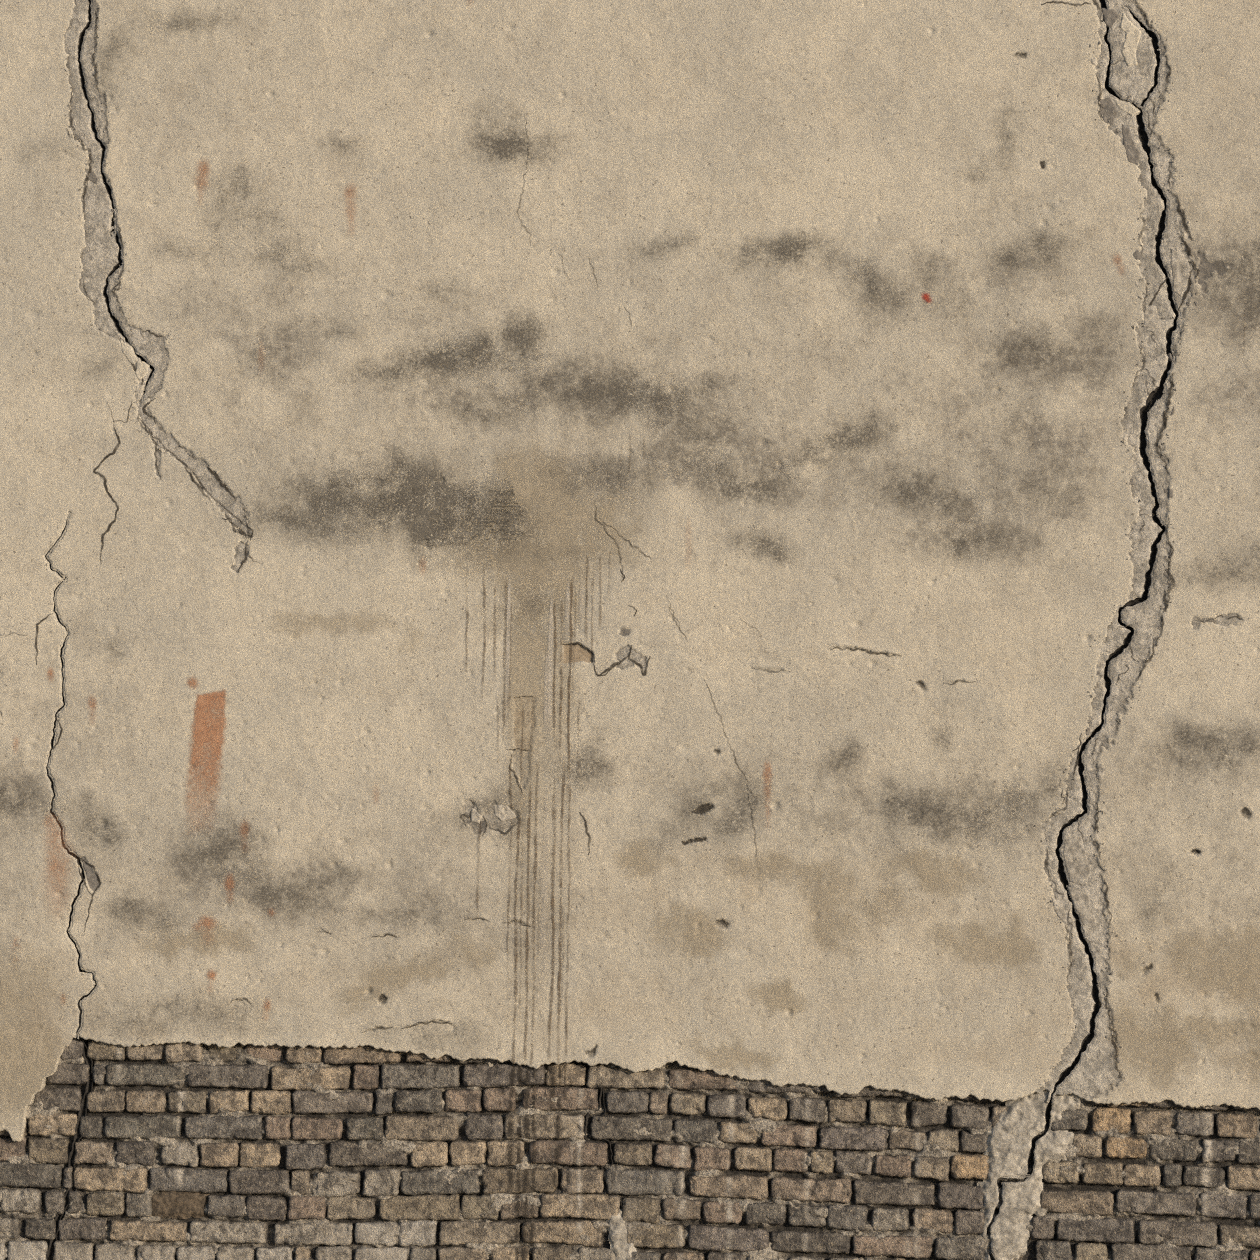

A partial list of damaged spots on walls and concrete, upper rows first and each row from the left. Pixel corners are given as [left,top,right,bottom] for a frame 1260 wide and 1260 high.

crack [63,0,254,560]
water stain [380,318,540,378]
water stain [529,368,638,413]
water stain [703,464,780,502]
water stain [898,473,961,515]
flaking render [561,606,651,676]
crack [977,0,1232,1260]
rust [188,679,226,792]
flaking render [460,799,519,836]
crack [35,512,101,1260]
water stain [259,450,639,1260]
spalling [151,1191,210,1219]